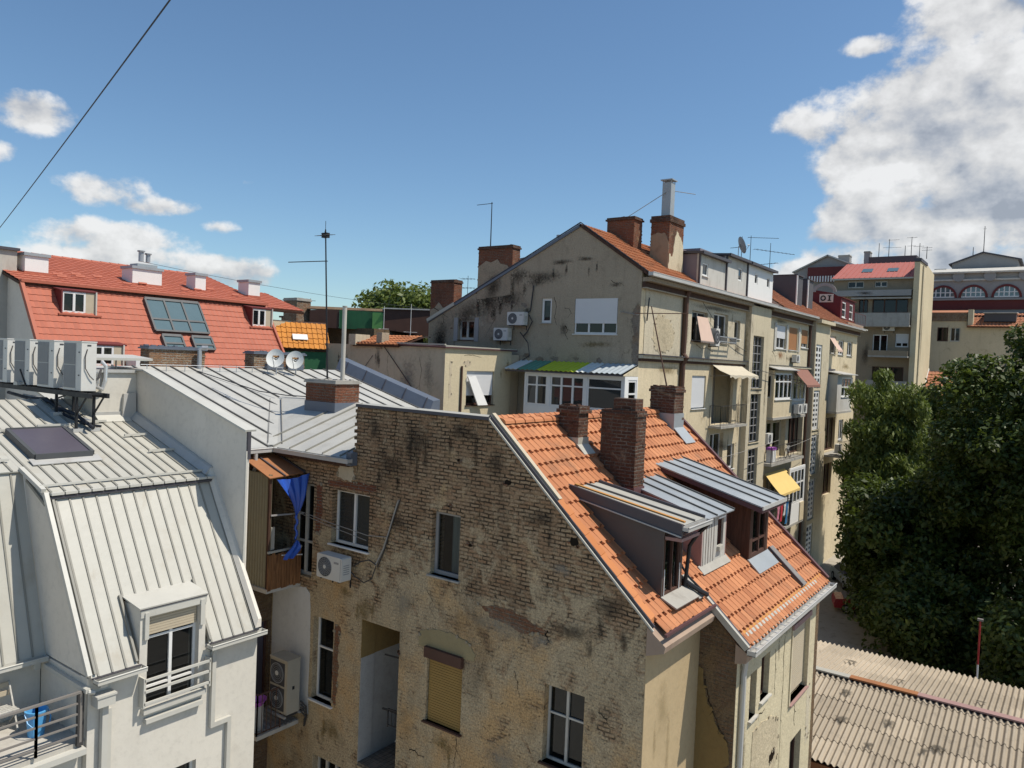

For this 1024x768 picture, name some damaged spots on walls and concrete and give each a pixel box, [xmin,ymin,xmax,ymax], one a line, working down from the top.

spalling [476,602,550,636]